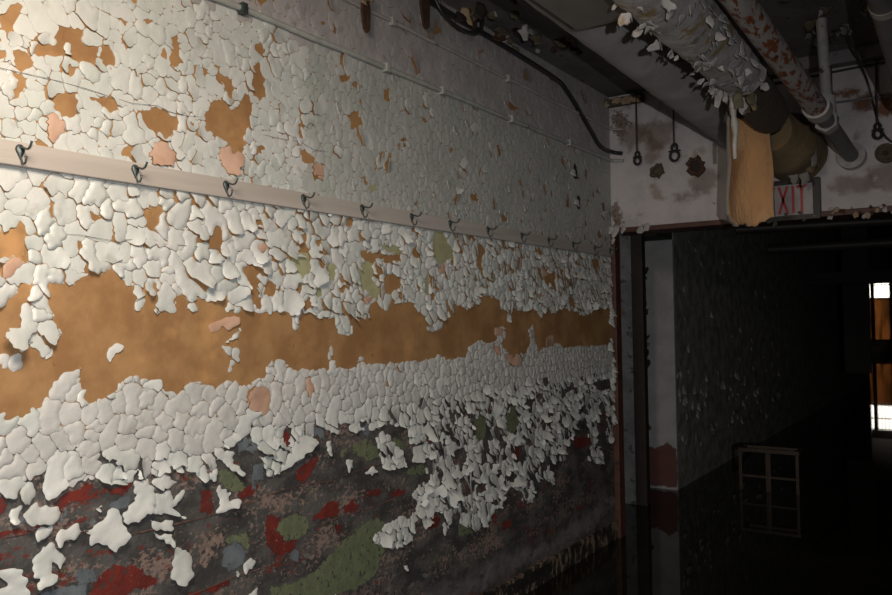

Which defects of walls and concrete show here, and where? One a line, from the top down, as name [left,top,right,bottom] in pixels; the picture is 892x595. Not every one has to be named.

peeling [455,0,543,54]
flaking render [0,0,328,191]
peeling [338,54,406,172]
flaking render [605,96,640,140]
flaking render [0,173,650,595]